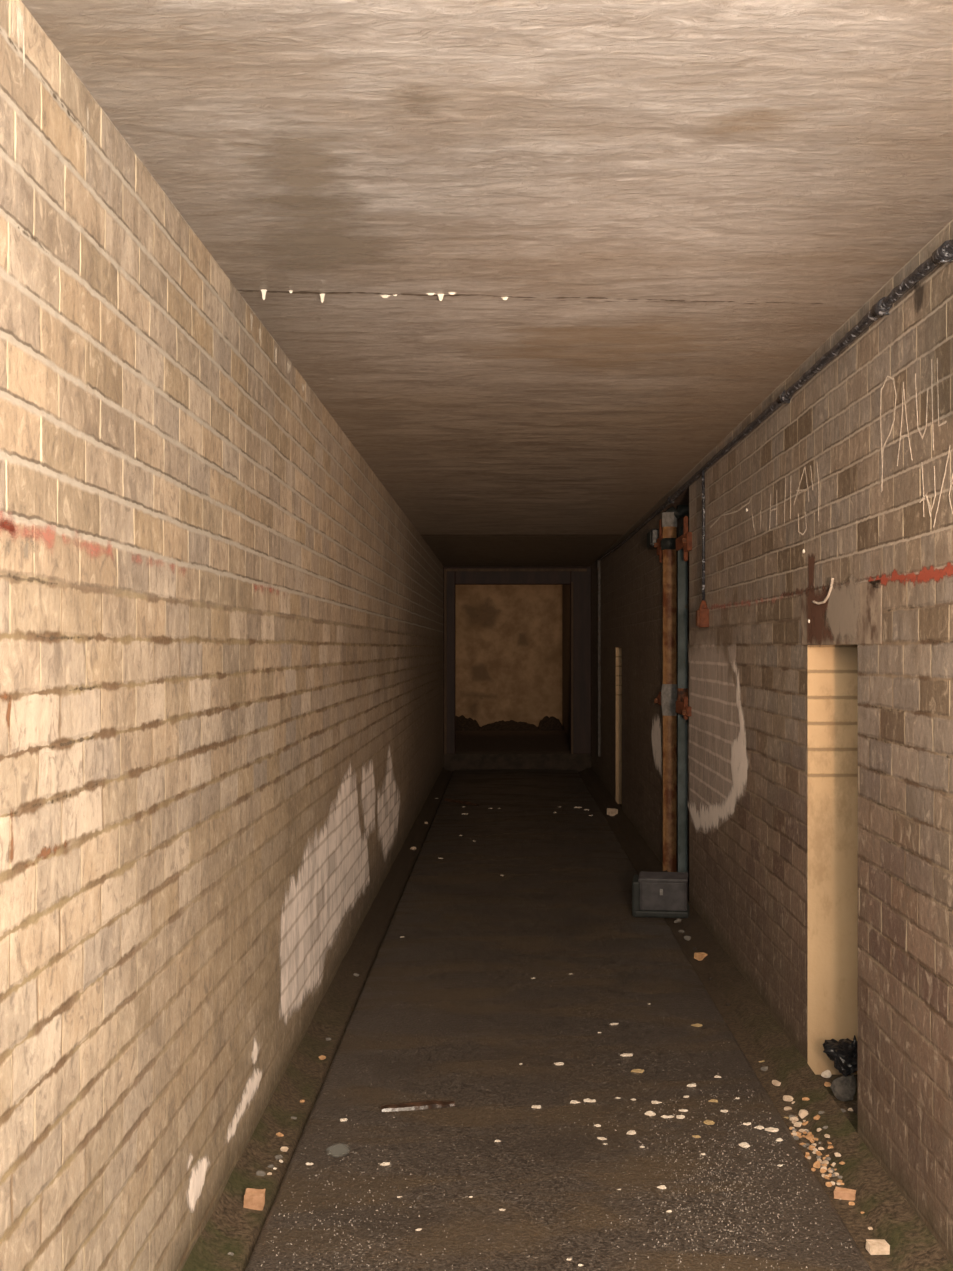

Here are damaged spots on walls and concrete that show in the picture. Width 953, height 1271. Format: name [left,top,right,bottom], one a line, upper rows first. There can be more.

water stain [651,716,662,774]
water stain [688,644,749,831]
water stain [280,746,400,1024]